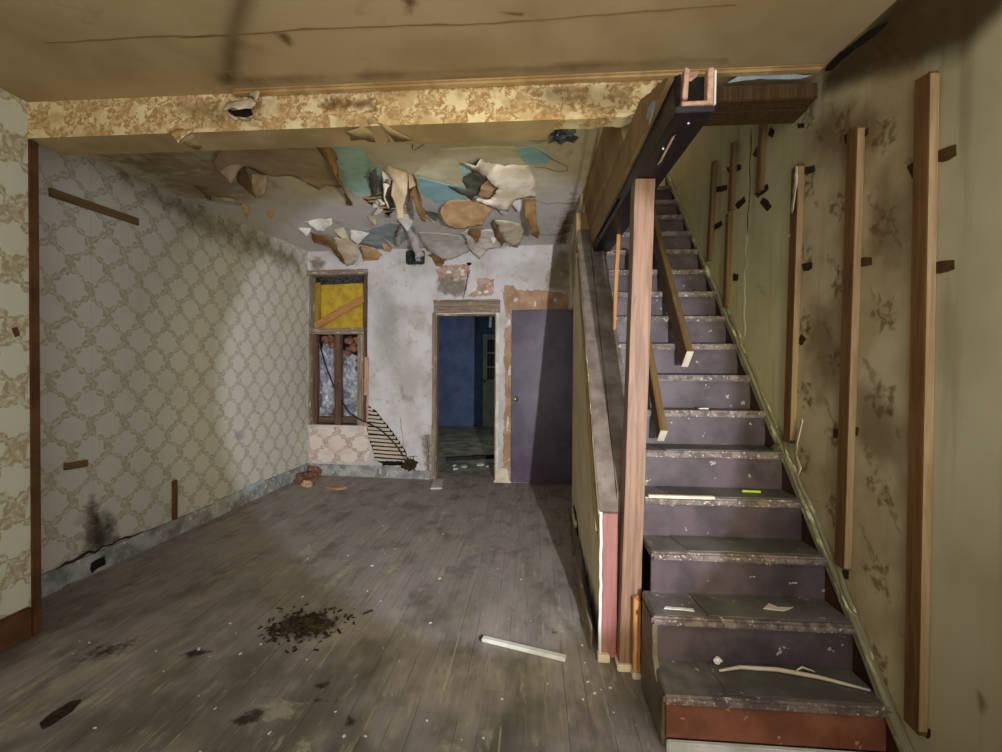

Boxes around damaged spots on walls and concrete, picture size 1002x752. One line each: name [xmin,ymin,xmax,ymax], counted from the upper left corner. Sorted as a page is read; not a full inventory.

flaking render [330,146,383,197]
flaking render [415,146,550,203]
flaking render [360,223,416,249]
flaking render [436,262,569,480]
mould [87,503,116,549]